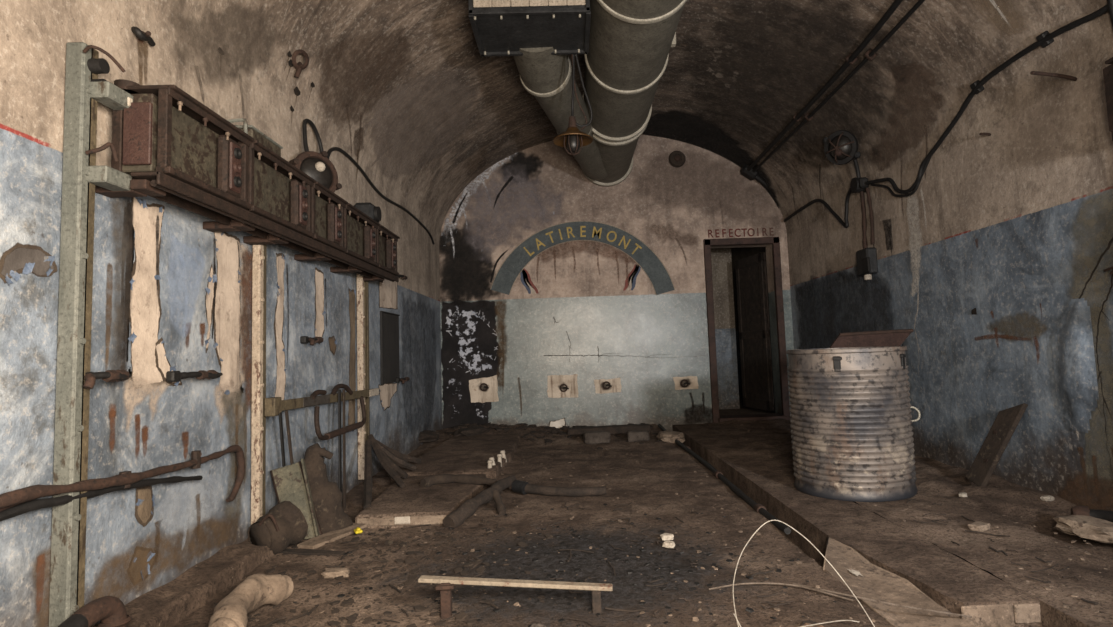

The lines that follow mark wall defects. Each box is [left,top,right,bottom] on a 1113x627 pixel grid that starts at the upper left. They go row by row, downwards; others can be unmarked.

damp [321,32,407,179]
peeling [0,243,57,286]
peeling [117,197,182,428]
peeling [205,232,249,424]
peeling [274,253,289,400]